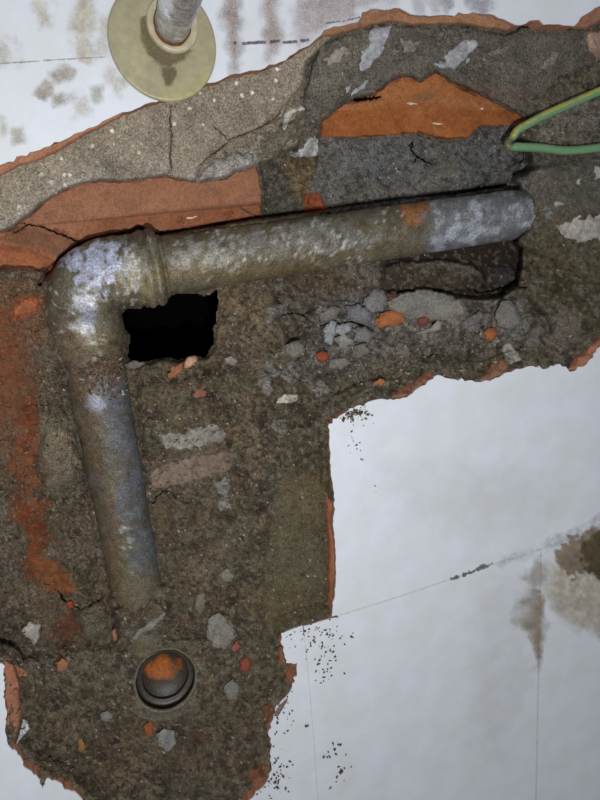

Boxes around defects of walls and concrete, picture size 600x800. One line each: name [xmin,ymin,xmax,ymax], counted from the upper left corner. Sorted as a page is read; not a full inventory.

crack [167,107,175,174]
crack [199,107,283,166]
spalling [0,6,600,283]
crack [13,223,80,242]
spalling [568,336,600,371]
spalling [392,372,431,398]
flaking render [150,448,235,490]
spalling [325,493,335,606]
leakage [548,528,600,632]
spalling [4,661,30,745]
rust [143,653,187,696]
spalling [277,635,296,684]